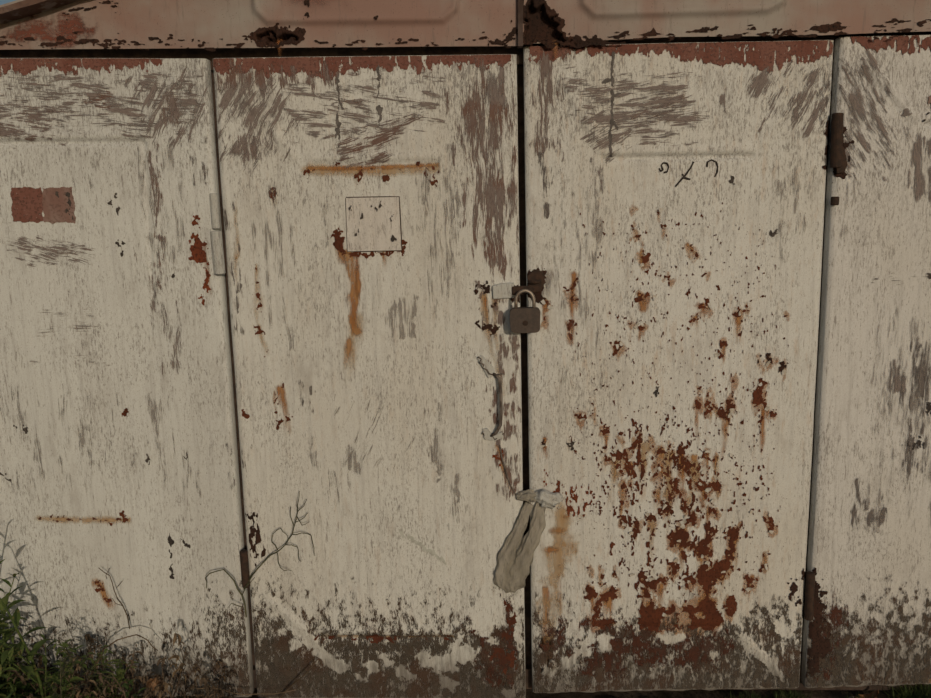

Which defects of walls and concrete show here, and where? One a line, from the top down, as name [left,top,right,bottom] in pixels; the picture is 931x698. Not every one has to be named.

rust [188,215,211,305]
peeling [0,54,519,375]
rust [328,228,408,356]
rust [303,161,439,187]
rust [469,281,500,336]
peeling [528,47,709,273]
peeling [747,49,931,202]
peeling [475,281,521,502]
peeling [871,310,931,480]
peeling [543,469,603,519]
rust [574,353,788,637]
rust [785,568,832,678]